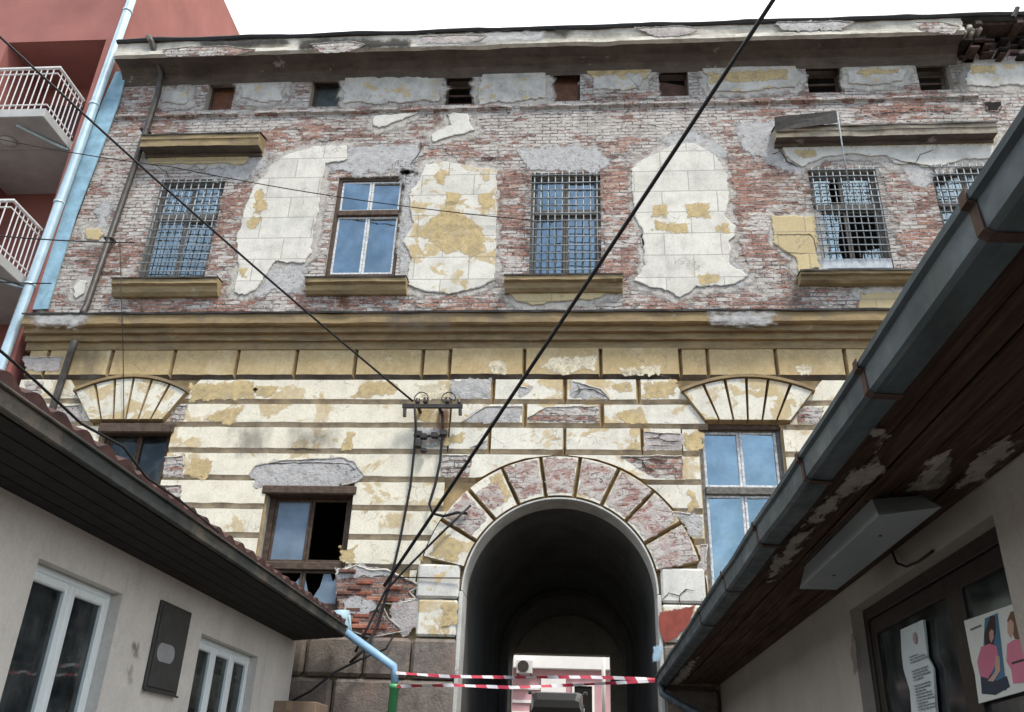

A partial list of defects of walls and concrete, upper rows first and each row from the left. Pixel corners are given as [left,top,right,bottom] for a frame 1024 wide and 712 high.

flaking render [138,66,1005,312]
flaking render [64,222,131,303]
spalling [249,432,365,489]
spalling [412,355,708,571]
crack [632,432,682,472]
peeling [767,427,892,583]
peeling [905,435,1022,493]
flaking render [335,544,459,638]